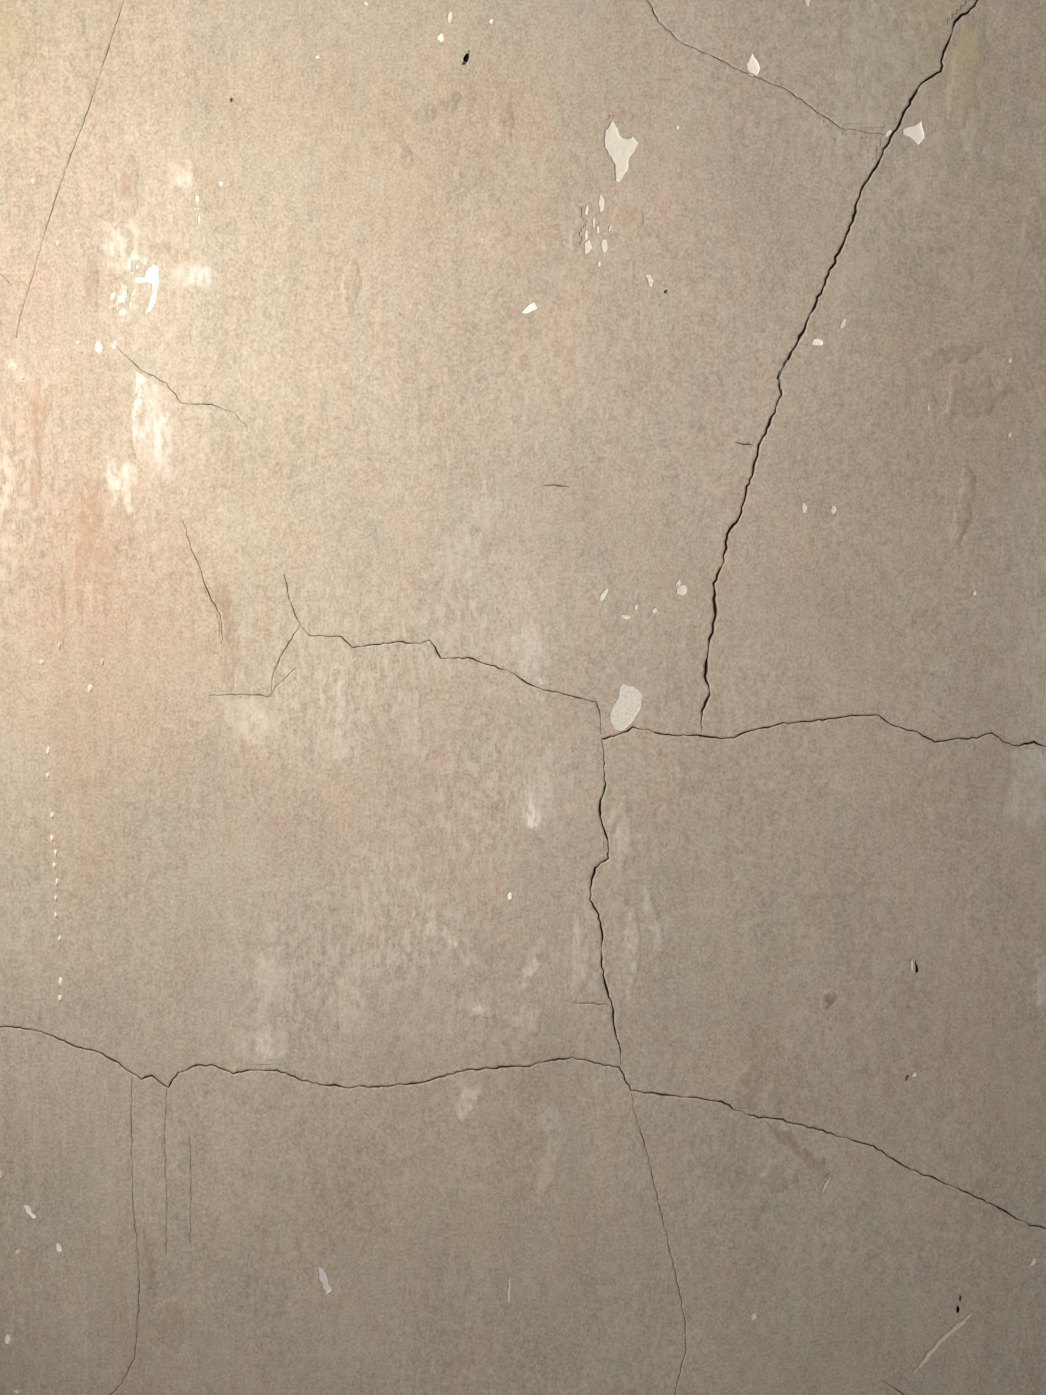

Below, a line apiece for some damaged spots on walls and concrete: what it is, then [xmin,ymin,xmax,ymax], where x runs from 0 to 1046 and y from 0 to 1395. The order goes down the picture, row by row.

crack [0,0,126,338]
peeling [603,120,638,182]
peeling [885,121,924,145]
peeling [584,193,611,266]
crack [112,343,248,429]
crack [183,521,223,640]
crack [589,0,1046,1065]
crack [209,574,602,734]
crack [573,1000,608,1008]
crack [0,1024,1046,1395]